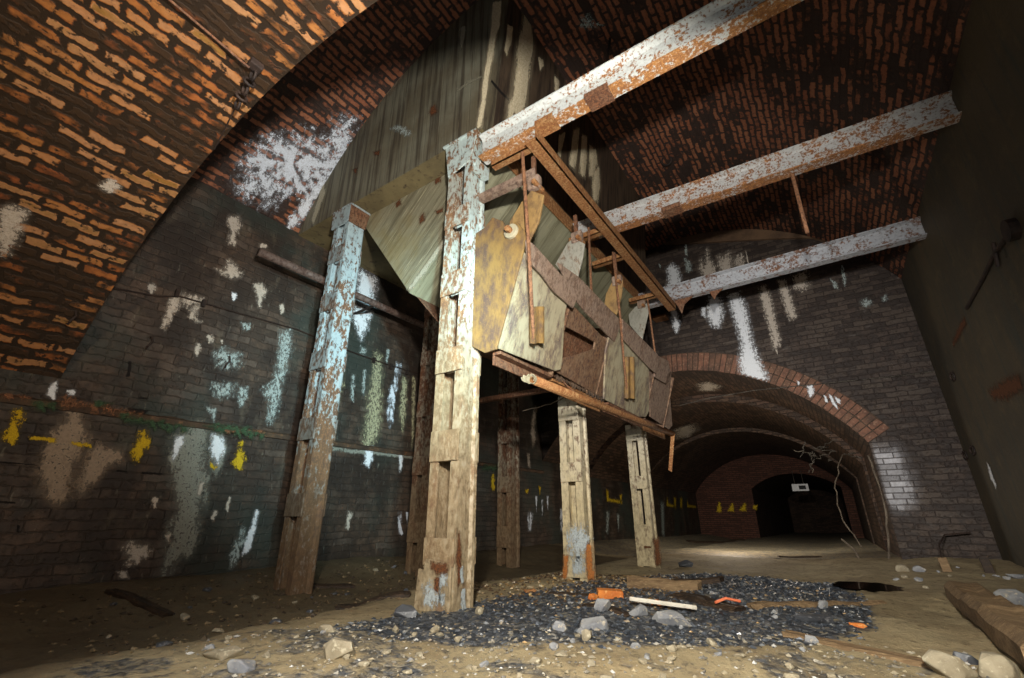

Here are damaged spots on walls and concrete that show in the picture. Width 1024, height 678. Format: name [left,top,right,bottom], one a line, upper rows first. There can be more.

water stain [234,114,357,229]
water stain [161,292,204,330]
water stain [216,260,242,278]
water stain [226,216,243,246]
water stain [254,283,267,307]
water stain [262,328,292,425]
water stain [333,268,416,470]
water stain [701,293,769,382]
water stain [758,270,810,354]
water stain [161,334,249,577]
water stain [117,540,153,579]
corrosion [430,531,462,592]